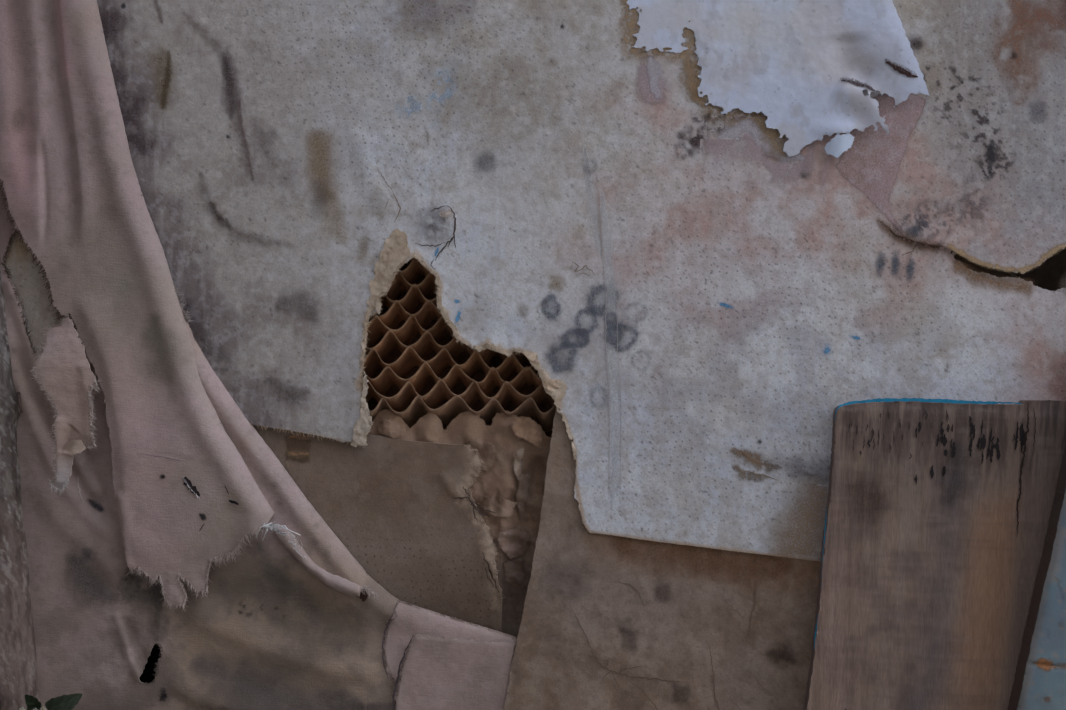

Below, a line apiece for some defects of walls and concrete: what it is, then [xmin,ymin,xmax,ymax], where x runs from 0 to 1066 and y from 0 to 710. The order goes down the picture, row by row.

peeling [621,0,930,237]
peeling [350,229,460,447]
leakage [542,282,561,319]
leakage [547,285,638,372]
crack [878,219,1066,293]
peeling [474,342,576,460]
crack [568,602,687,710]